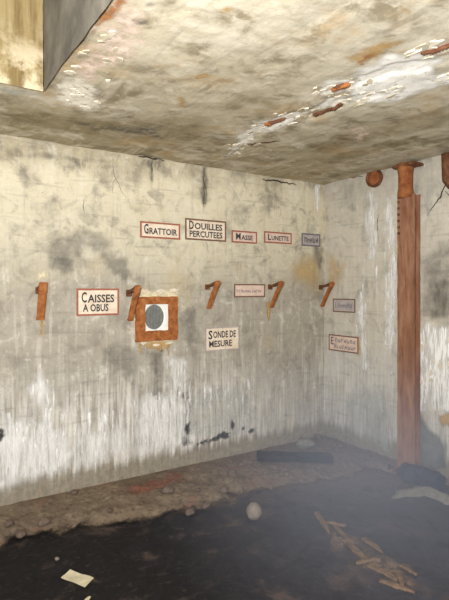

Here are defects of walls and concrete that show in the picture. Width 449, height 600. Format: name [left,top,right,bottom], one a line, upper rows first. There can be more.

spalling [404,39,449,60]
spalling [224,78,406,157]
water stain [364,192,397,349]
water stain [356,284,367,371]
water stain [0,359,191,488]
water stain [197,421,234,445]